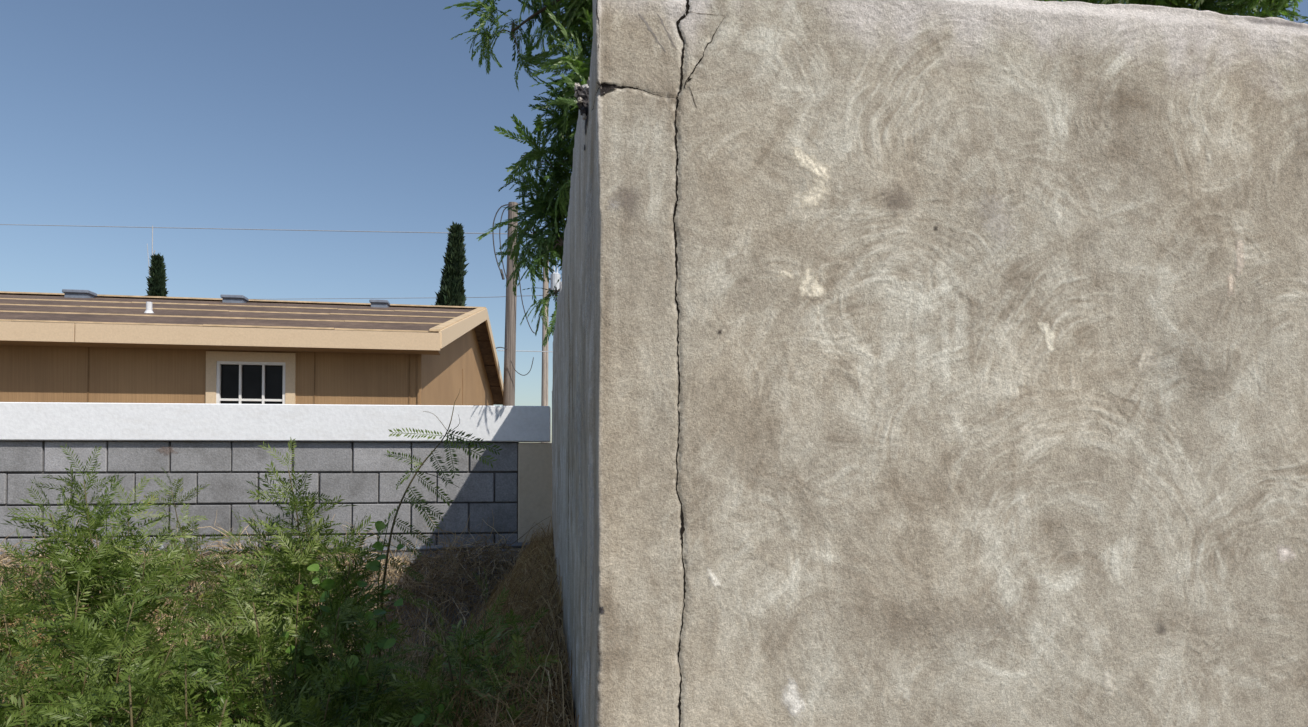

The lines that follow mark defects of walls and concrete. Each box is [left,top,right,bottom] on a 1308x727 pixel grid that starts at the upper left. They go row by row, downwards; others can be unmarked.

crack [592,0,725,727]